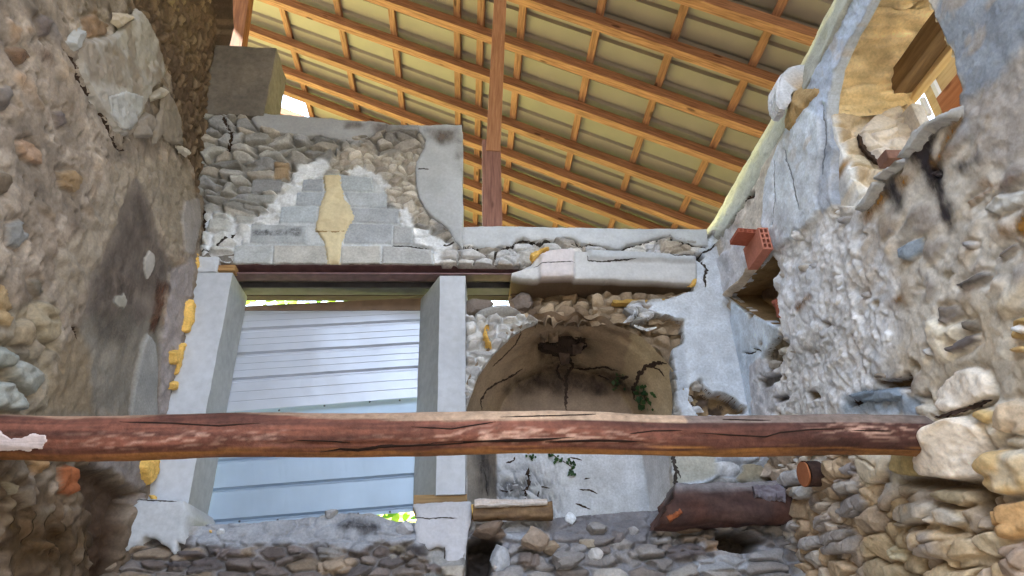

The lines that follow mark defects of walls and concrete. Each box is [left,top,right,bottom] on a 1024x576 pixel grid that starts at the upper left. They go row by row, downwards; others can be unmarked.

crack [63,49,124,151]
water stain [883,177,902,208]
water stain [910,134,952,229]
crack [394,238,715,287]
spalling [623,303,683,337]
crack [480,328,522,410]
spalling [538,330,588,365]
water stain [507,340,641,395]
crack [556,357,668,410]